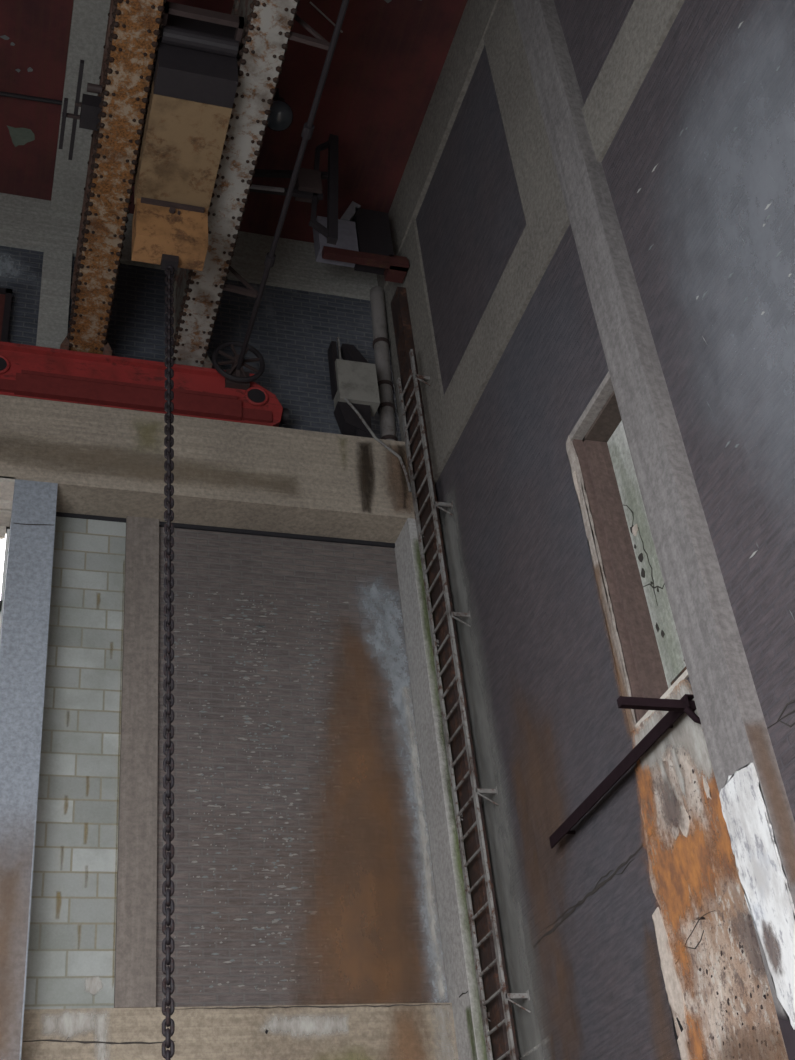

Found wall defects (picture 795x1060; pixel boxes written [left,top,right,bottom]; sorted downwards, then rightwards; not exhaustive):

peeling [7,126,35,147]
rust [572,470,580,502]
leakage [174,591,345,992]
rust [313,643,417,1005]
leakage [362,582,454,1060]
rust [636,759,735,990]
flaking render [641,742,795,1060]
crack [23,1036,175,1044]
leakage [264,1016,346,1036]
rust [686,1011,706,1060]